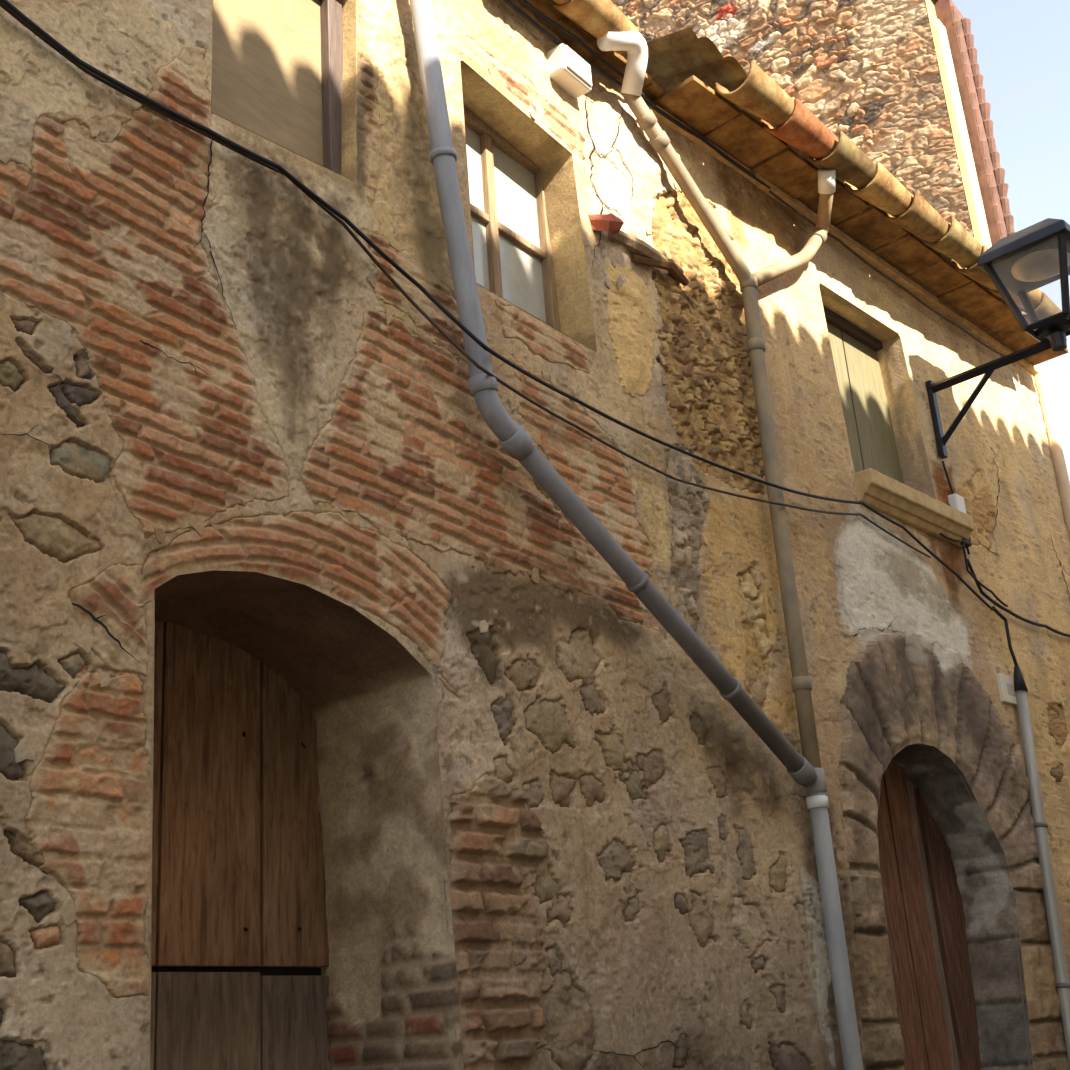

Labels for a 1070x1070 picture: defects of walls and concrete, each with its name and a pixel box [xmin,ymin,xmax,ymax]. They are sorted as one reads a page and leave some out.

crack [194,140,236,329]
leakage [248,168,344,395]
crack [585,95,633,270]
spalling [651,181,765,633]
peeling [0,37,671,998]
crack [972,450,1000,556]
crack [71,603,140,663]
spalling [736,562,774,710]
peeling [445,620,604,1070]
spalling [674,892,716,948]
spalling [652,816,756,880]
spalling [731,896,773,974]